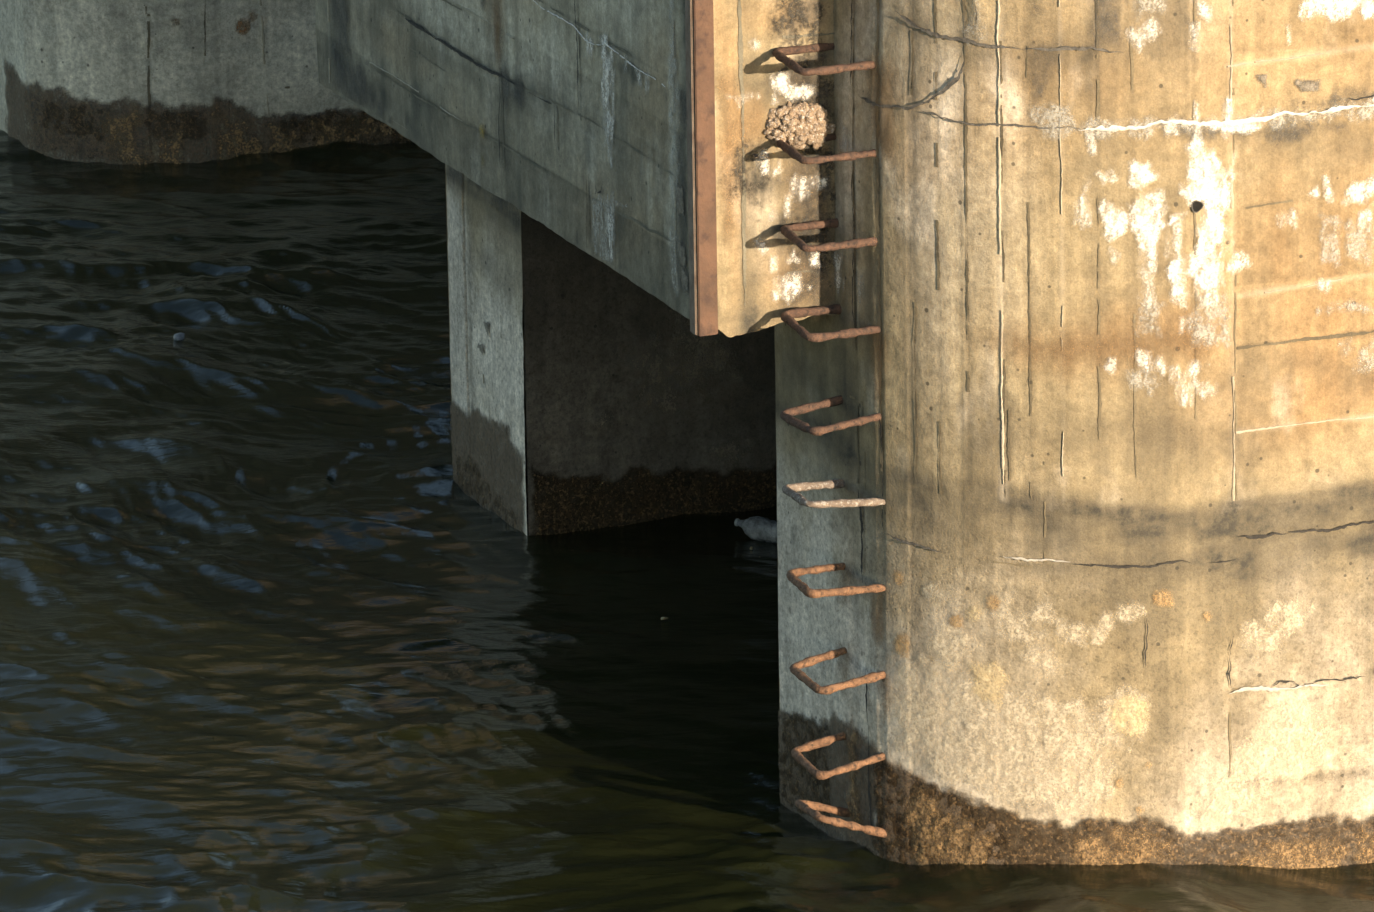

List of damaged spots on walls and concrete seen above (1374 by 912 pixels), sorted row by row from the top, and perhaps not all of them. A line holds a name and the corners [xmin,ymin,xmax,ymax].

crack [406,0,665,160]
leakage [771,0,834,116]
crack [850,3,1374,153]
leakage [1300,0,1374,19]
leakage [732,144,776,205]
leakage [758,127,847,305]
leakage [1080,124,1246,344]
leakage [1310,179,1374,261]
leakage [1131,351,1204,404]
crack [858,419,946,583]
crack [1004,521,1374,569]
crack [1228,636,1366,694]